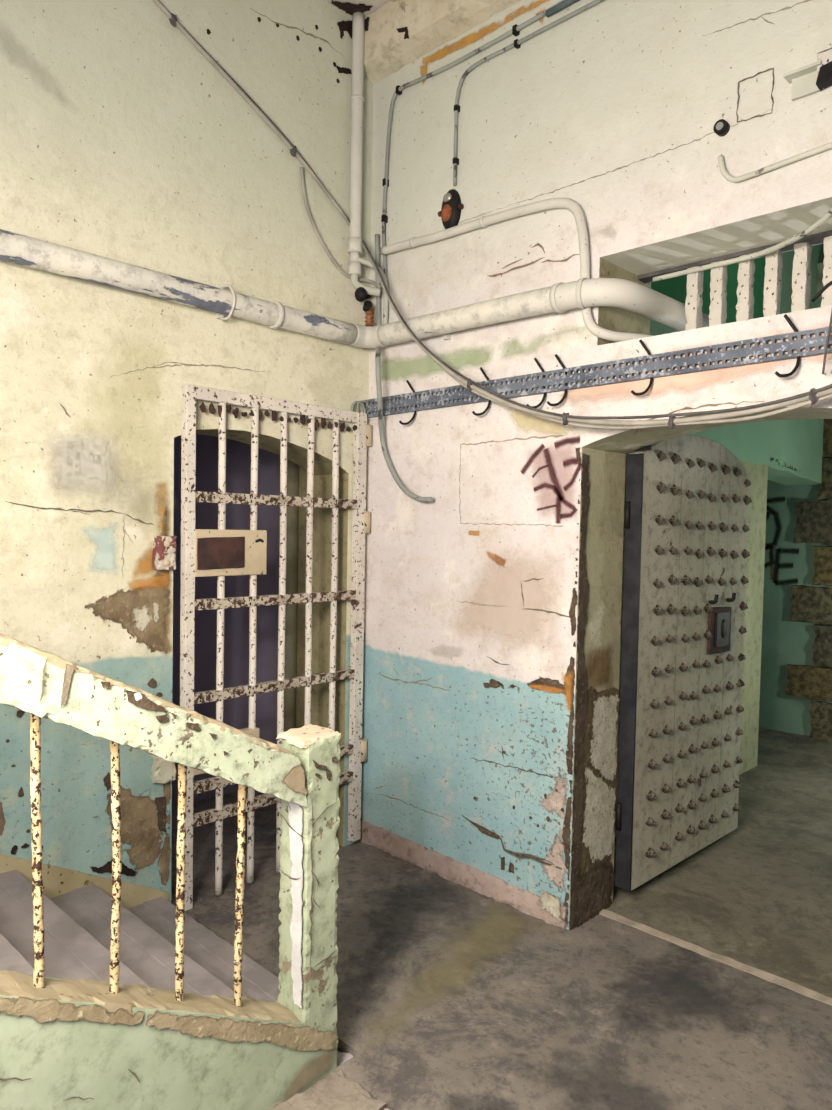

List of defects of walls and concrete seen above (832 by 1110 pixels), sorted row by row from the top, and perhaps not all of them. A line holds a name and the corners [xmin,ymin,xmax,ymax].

crack [252,9,344,84]
crack [5,501,154,573]
flaking render [85,574,171,654]
peeling [60,664,74,708]
peeling [126,678,217,739]
peeling [483,448,620,930]
flaking render [90,772,171,886]
crack [373,784,562,873]
peeling [0,996,339,1051]